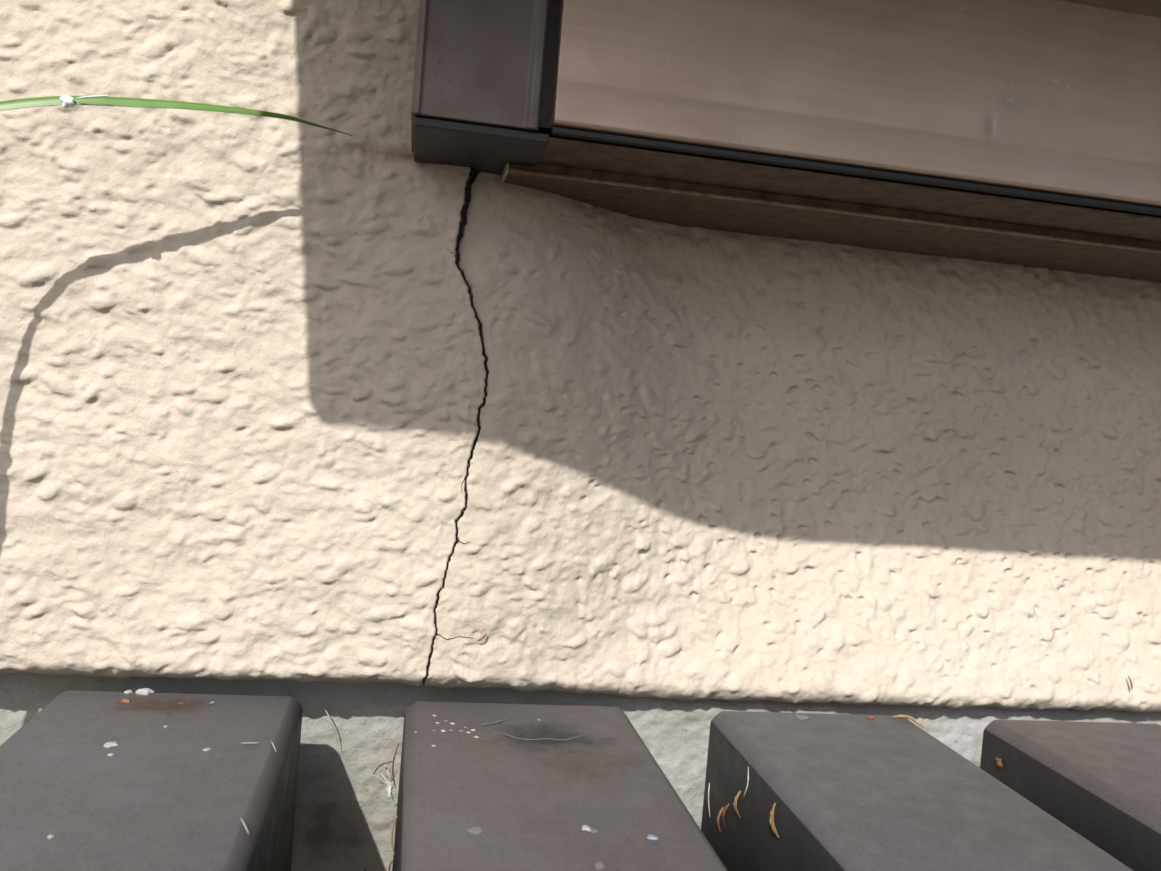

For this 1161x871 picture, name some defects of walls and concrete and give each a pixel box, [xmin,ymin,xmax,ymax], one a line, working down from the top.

crack [420,168,489,687]